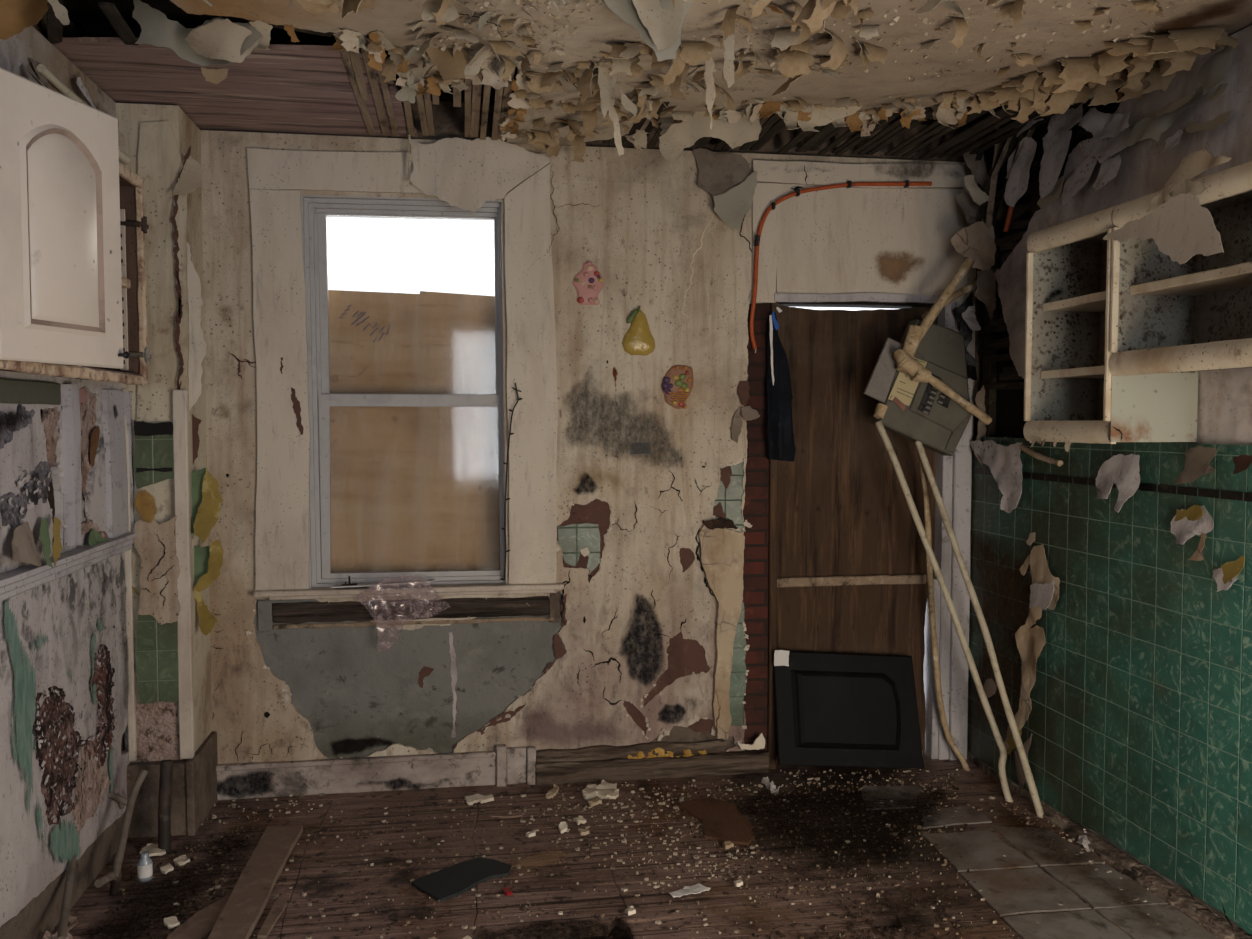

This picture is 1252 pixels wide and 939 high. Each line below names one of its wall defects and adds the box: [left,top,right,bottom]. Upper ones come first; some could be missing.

crack [171,146,191,390]
leakage [878,253,918,282]
spalling [0,379,108,542]
flaking render [134,516,181,625]
peeling [291,387,304,435]
peeling [556,497,617,585]
leakage [567,379,682,464]
crack [612,471,714,638]
peeling [703,459,753,533]
flaking render [246,591,574,758]
crack [561,570,622,705]
leakage [621,596,663,685]